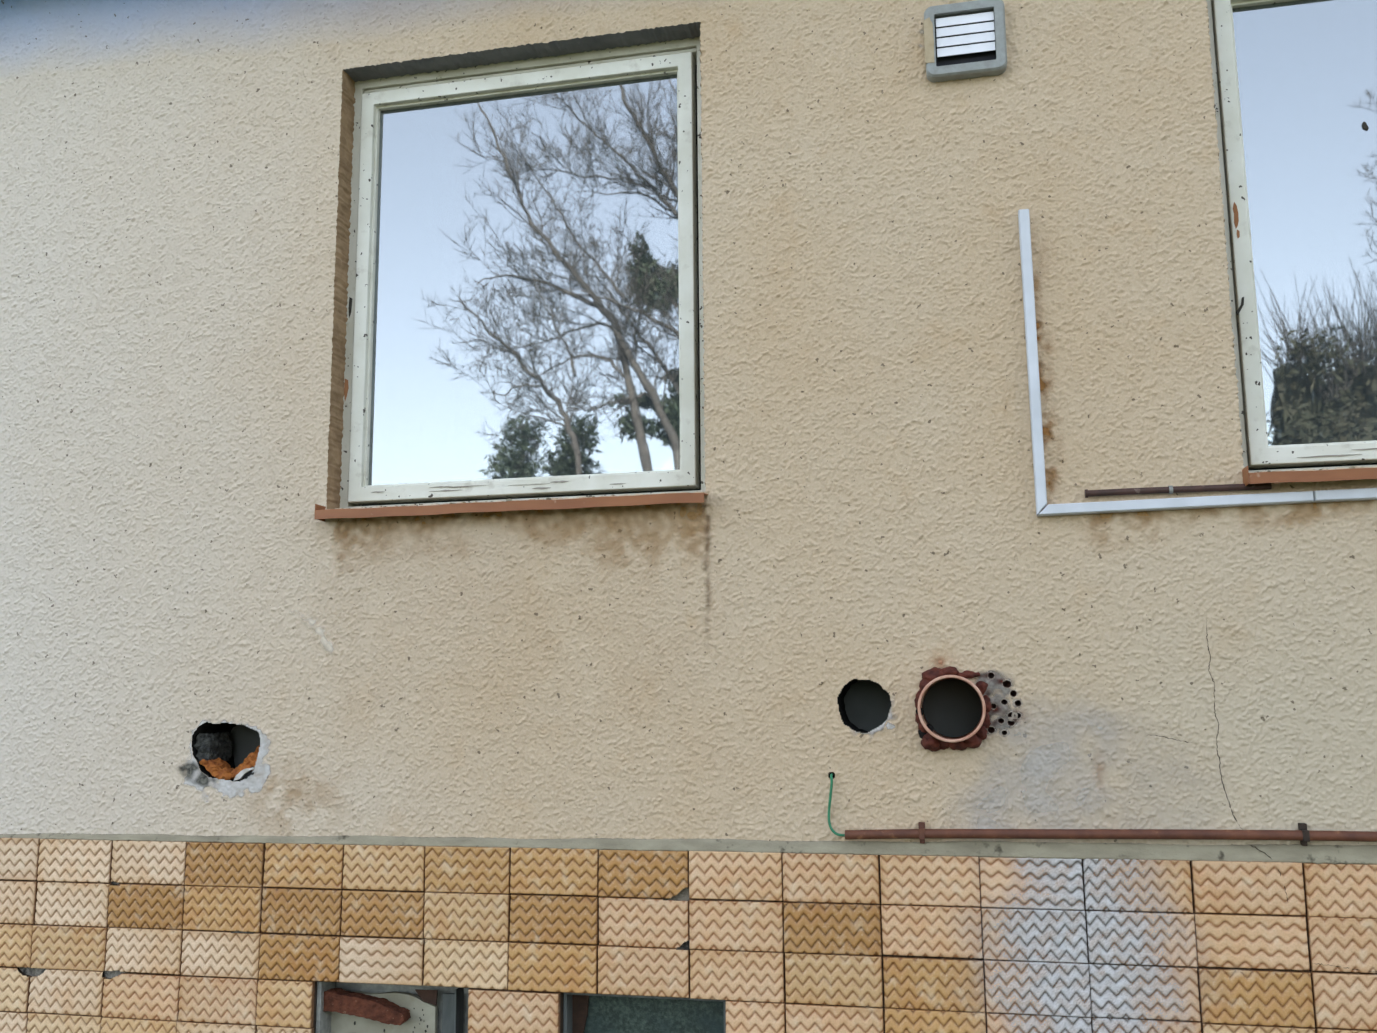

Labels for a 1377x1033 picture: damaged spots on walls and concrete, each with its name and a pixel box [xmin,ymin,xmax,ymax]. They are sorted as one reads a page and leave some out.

spalling [179,720,270,798]
crack [1155,622,1288,902]
leakage [995,858,1172,1033]